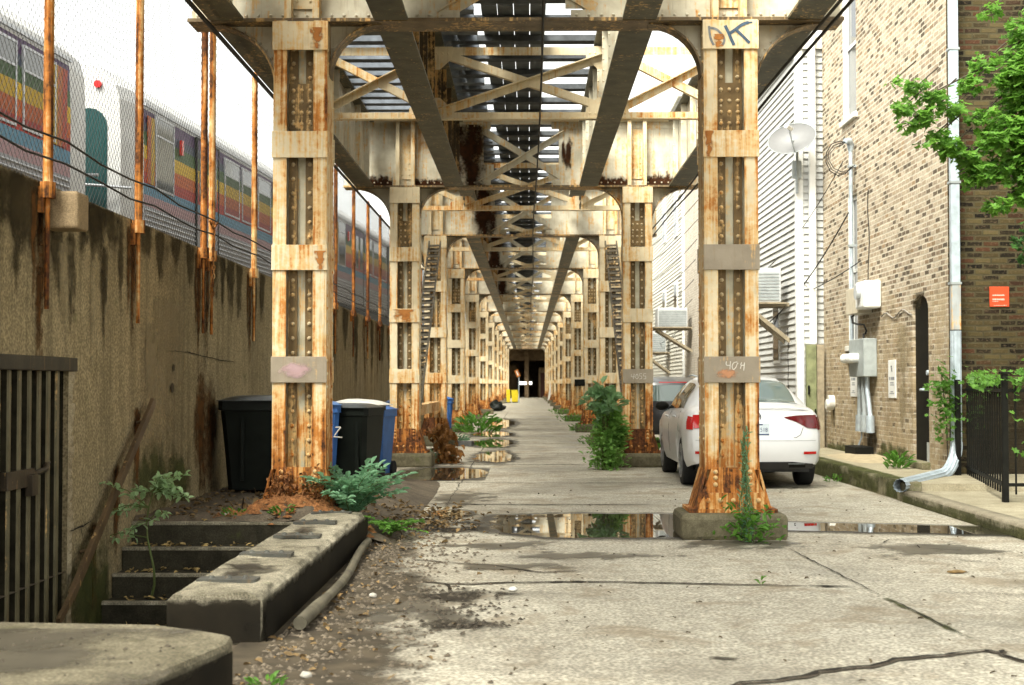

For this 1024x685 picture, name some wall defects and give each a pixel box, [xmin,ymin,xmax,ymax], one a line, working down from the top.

rust [310,27,323,48]
rust [705,130,714,157]
rust [460,125,510,294]
water stain [0,170,124,328]
water stain [141,226,194,285]
rust [314,251,325,269]
water stain [213,256,265,330]
rust [394,309,413,322]
rust [194,375,216,489]
crack [732,649,1024,685]